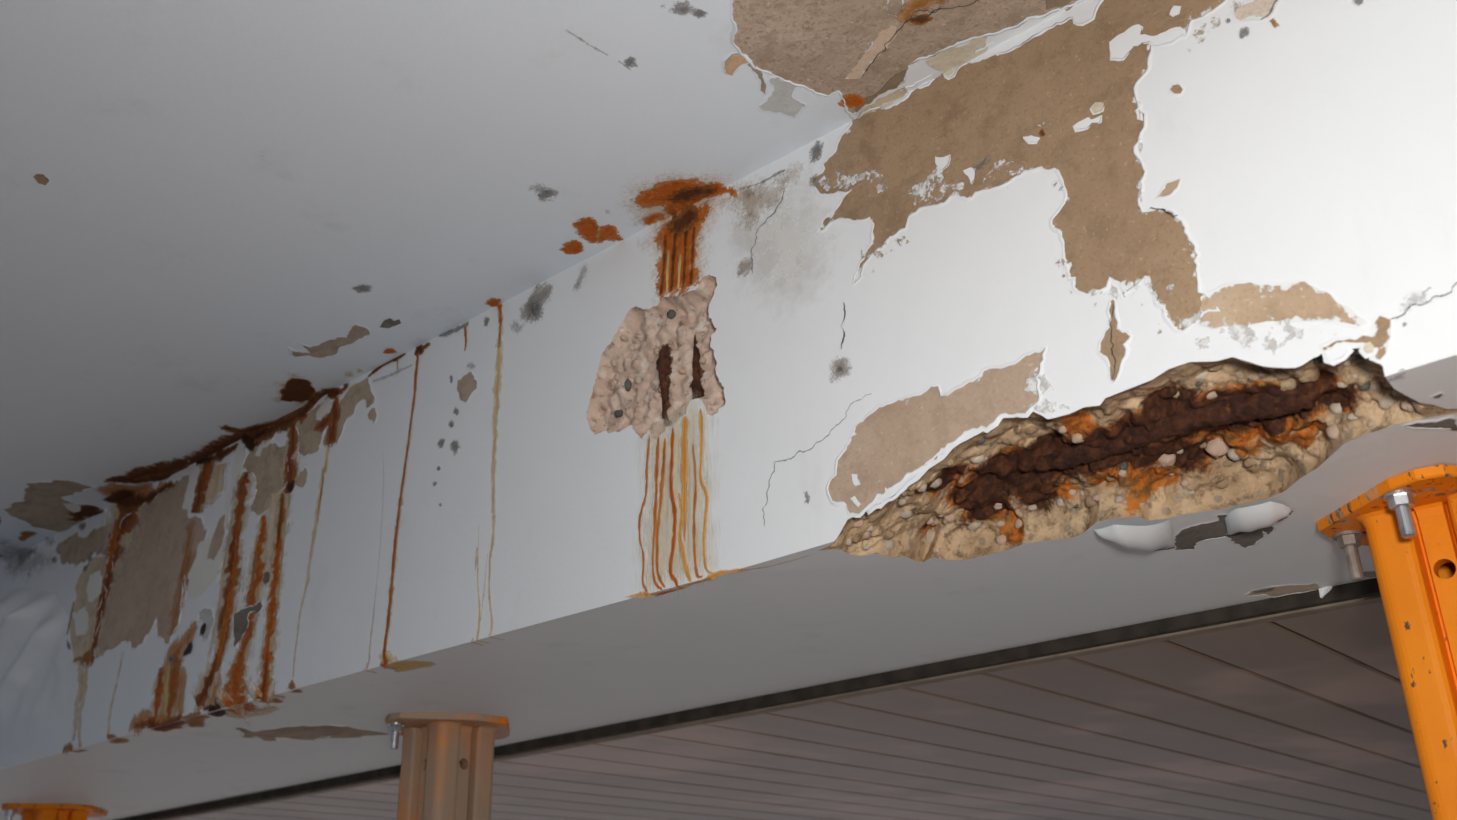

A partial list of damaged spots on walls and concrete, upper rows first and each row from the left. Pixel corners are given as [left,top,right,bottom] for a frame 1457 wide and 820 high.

peeling [2,473,270,670]
corrosion [63,321,469,754]
peeling [241,376,378,518]
corrosion [471,298,503,646]
corrosion [560,211,623,254]
spalling [587,275,726,439]
corrosion [630,178,738,300]
corrosion [631,409,765,599]
peeling [721,0,1457,563]